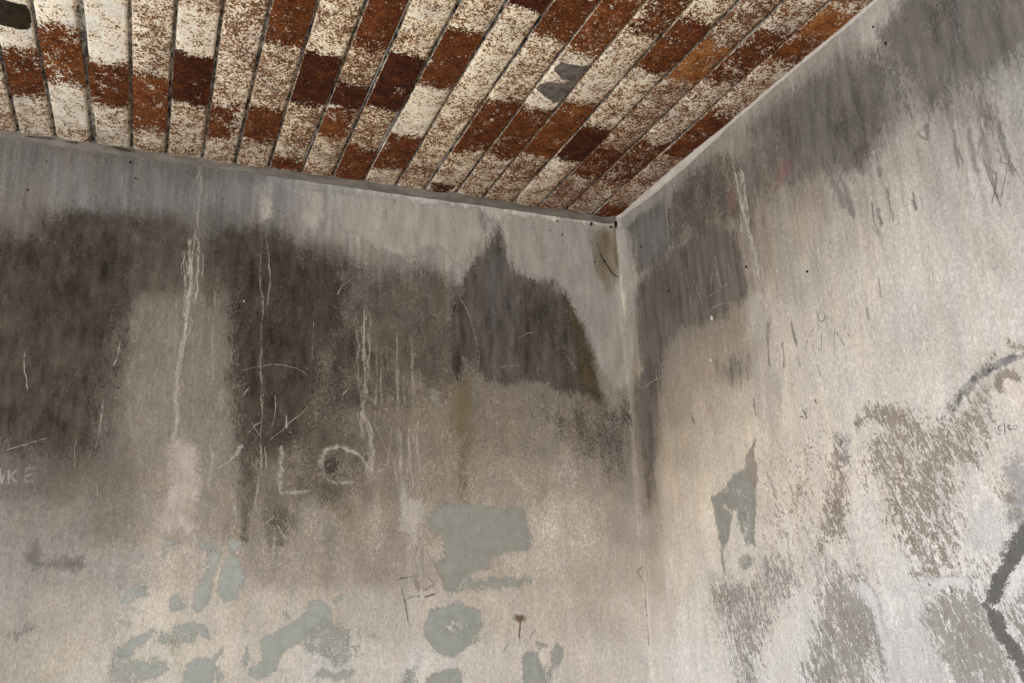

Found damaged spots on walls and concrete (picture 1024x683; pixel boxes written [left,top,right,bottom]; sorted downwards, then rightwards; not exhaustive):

rust [1,0,487,180]
rust [428,182,456,193]
peeling [536,62,590,102]
rust [452,97,737,185]
rust [508,0,861,87]
leakage [627,0,1024,497]
leakage [0,165,630,592]
peeling [706,352,1024,683]
peeling [106,537,248,683]
peeling [242,594,364,683]
peeling [399,502,534,683]